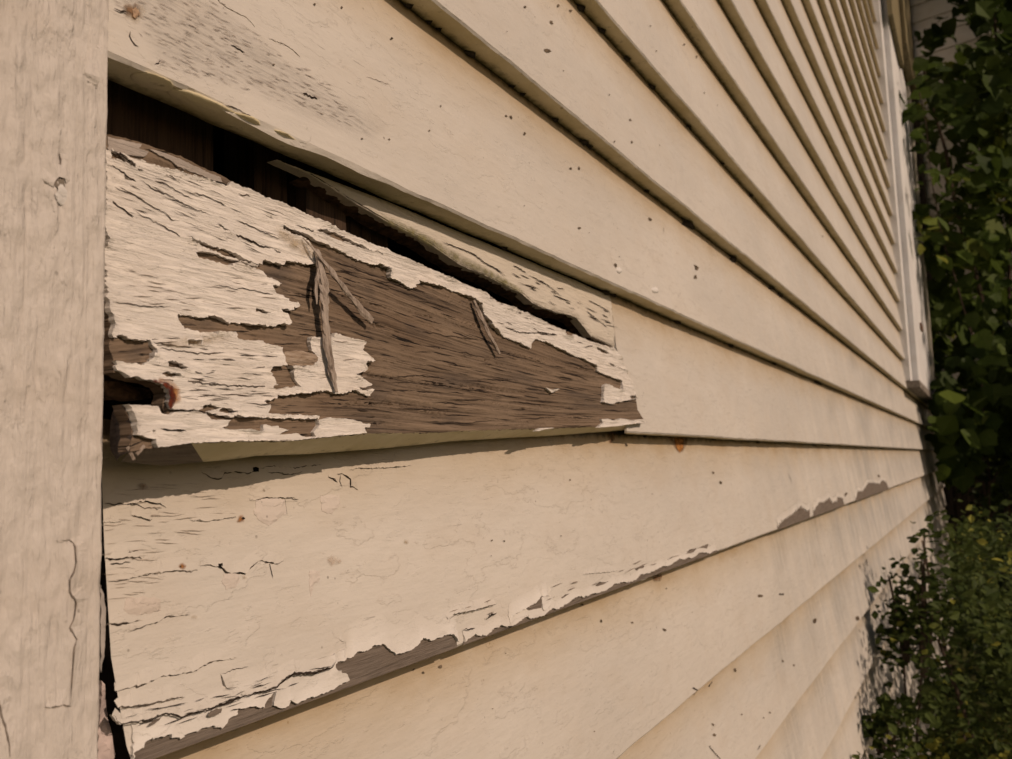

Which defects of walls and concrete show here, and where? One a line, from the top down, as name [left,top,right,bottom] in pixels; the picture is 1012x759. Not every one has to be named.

crack [117,0,361,126]
peeling [104,136,638,448]
peeling [98,585,116,759]
crack [110,648,336,725]
crack [45,455,411,708]
peeling [130,544,719,759]
peeling [595,418,647,428]
peeling [776,477,889,530]